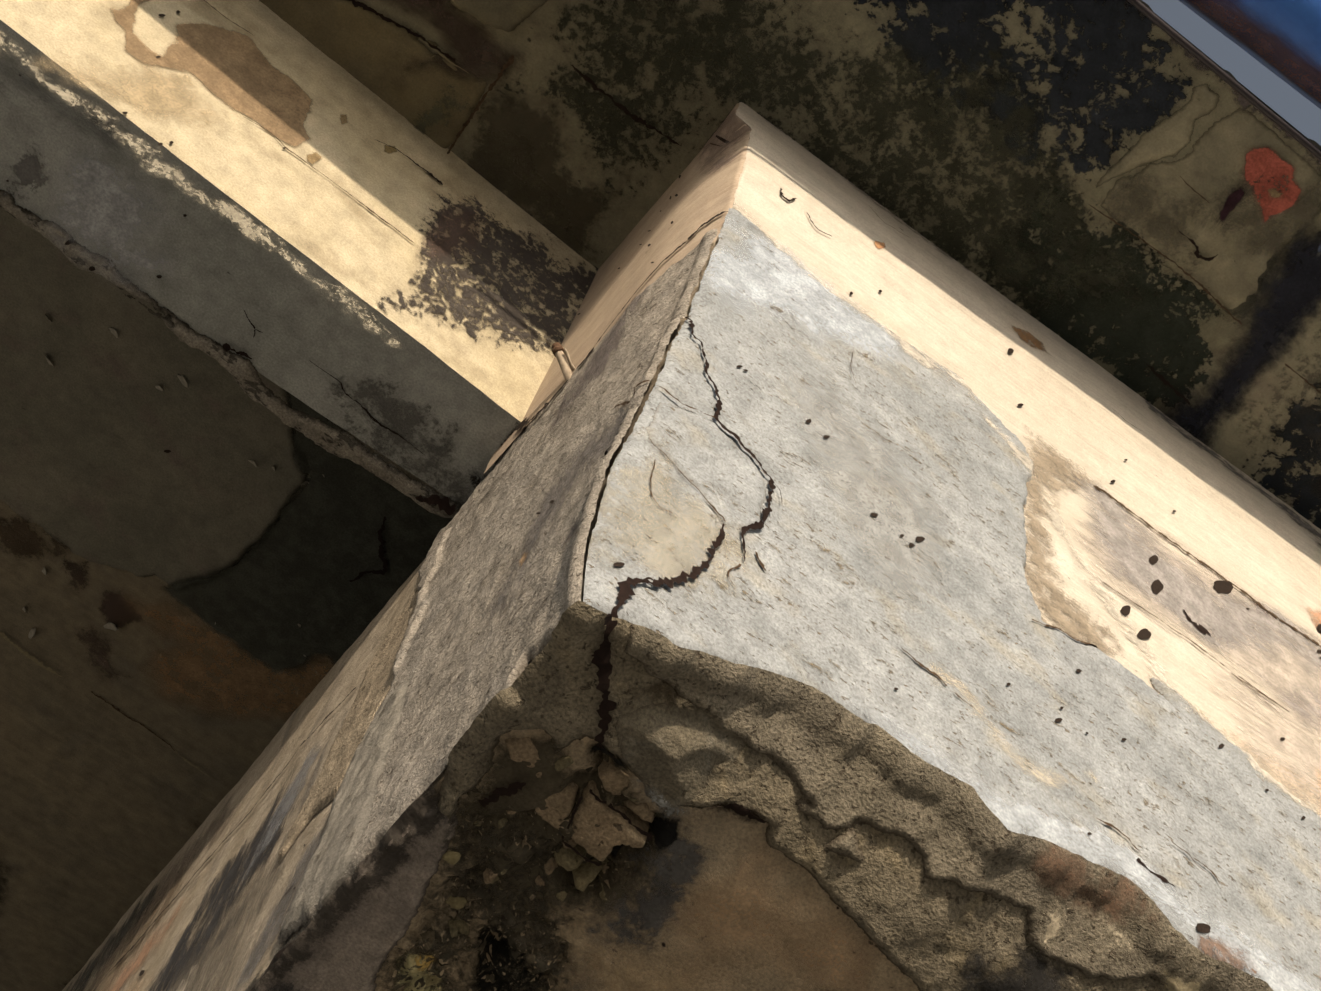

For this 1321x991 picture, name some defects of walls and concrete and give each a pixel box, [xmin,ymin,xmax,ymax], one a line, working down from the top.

crack [347,0,468,73]
corrosion [1186,0,1321,104]
crack [245,117,415,244]
leakage [378,0,1321,446]
crack [591,317,782,750]
peeling [1023,432,1120,655]
leakage [1242,382,1321,546]
leakage [64,808,231,991]
leakage [148,751,323,991]
leakage [381,806,573,991]
crack [706,803,766,823]
spalling [1196,923,1258,976]